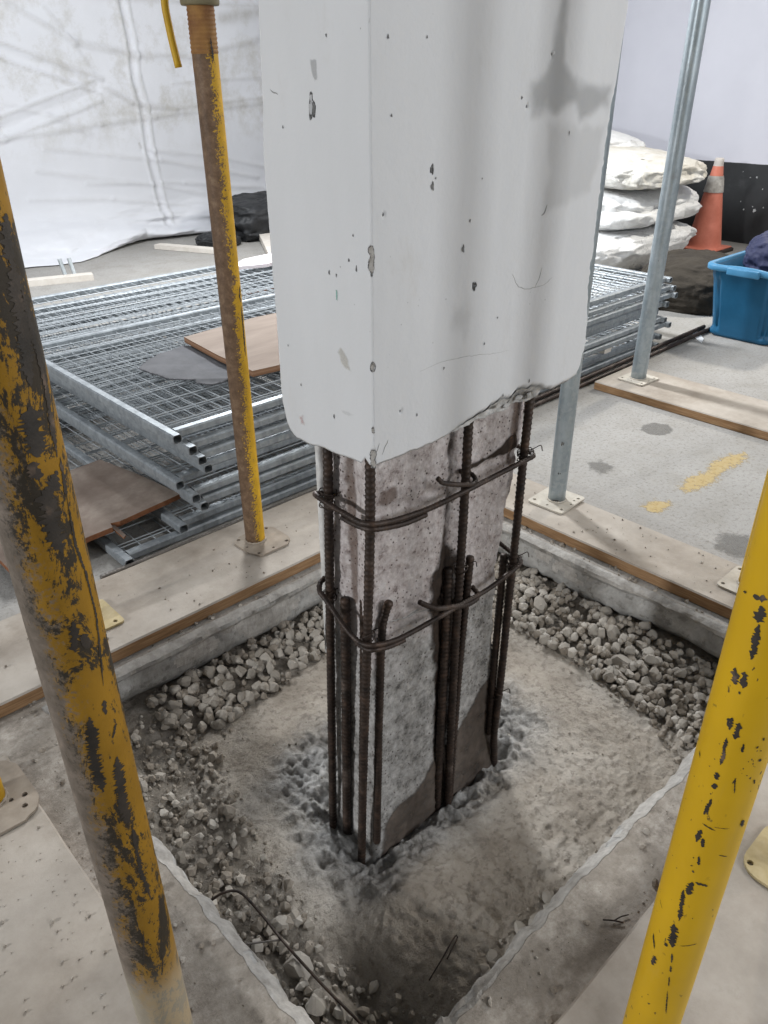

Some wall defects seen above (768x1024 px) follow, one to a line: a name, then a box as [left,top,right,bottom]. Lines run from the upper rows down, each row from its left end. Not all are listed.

rust [471,433,517,468]
rust [430,492,457,754]